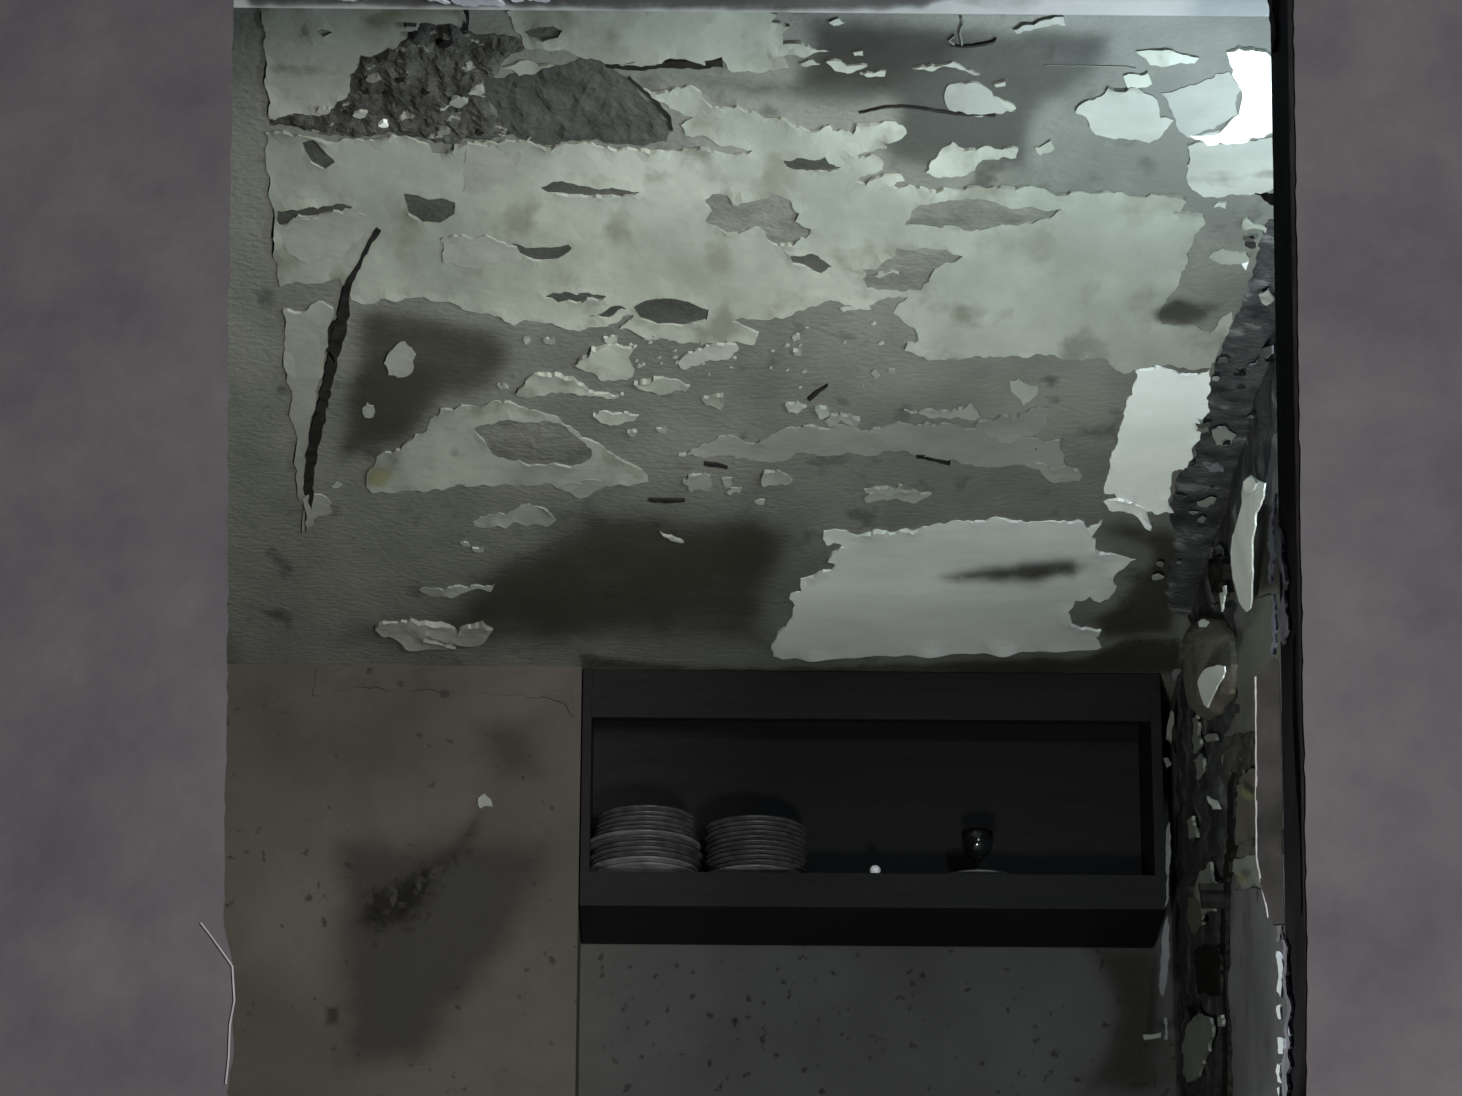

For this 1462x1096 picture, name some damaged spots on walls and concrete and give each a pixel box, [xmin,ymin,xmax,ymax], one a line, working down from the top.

crack [304,228,381,509]
peeling [260,0,1294,1096]
water stain [965,564,1074,580]
water stain [350,852,526,1050]